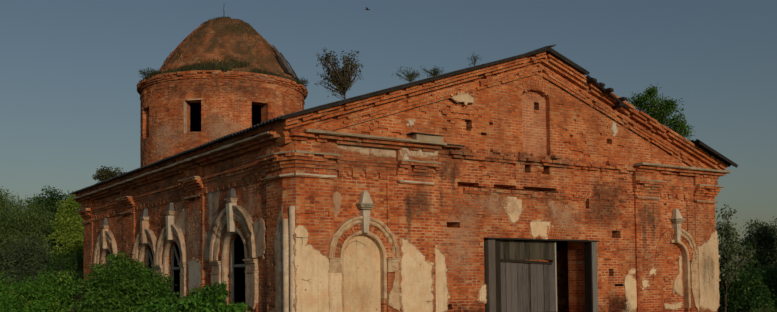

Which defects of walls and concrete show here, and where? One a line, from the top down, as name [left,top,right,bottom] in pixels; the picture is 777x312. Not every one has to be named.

spalling [355,92,472,135]